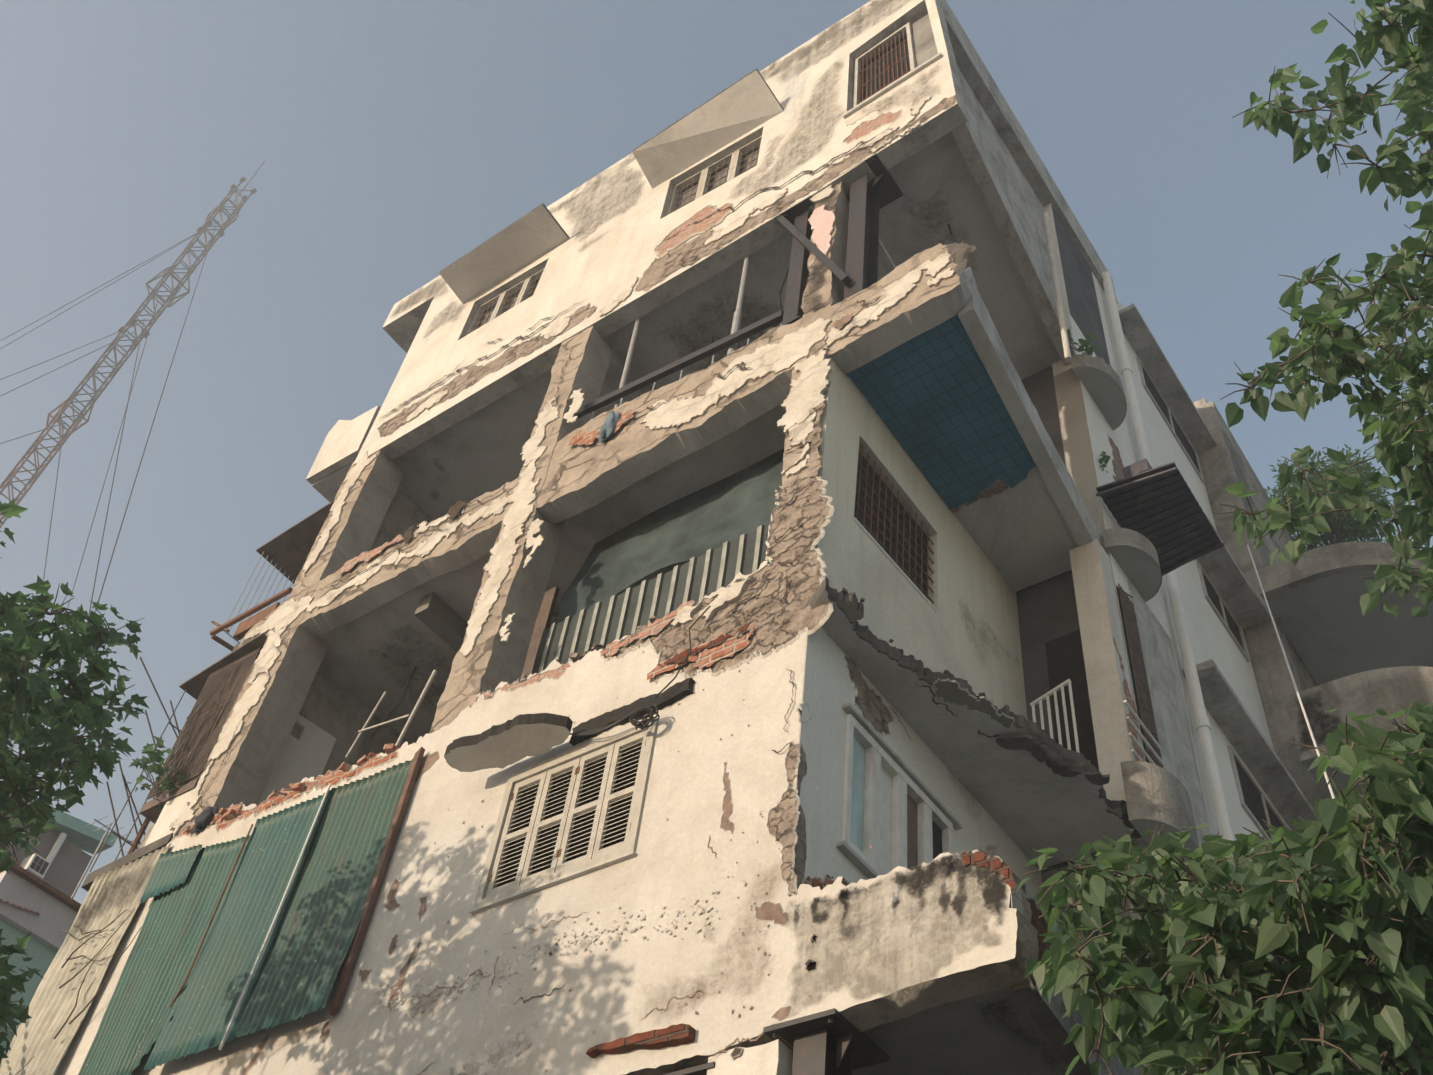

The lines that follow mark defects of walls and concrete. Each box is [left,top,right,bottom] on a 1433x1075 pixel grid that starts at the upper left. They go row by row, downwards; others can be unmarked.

leakage [552,156,641,246]
leakage [397,281,461,332]
peeling [302,94,957,577]
flaking render [169,241,1088,837]
flaking render [359,667,835,1033]
spalling [1106,799,1137,842]
crack [406,909,592,1004]
leakage [791,845,1006,1003]
crack [642,990,707,1019]
crack [708,1023,777,1061]